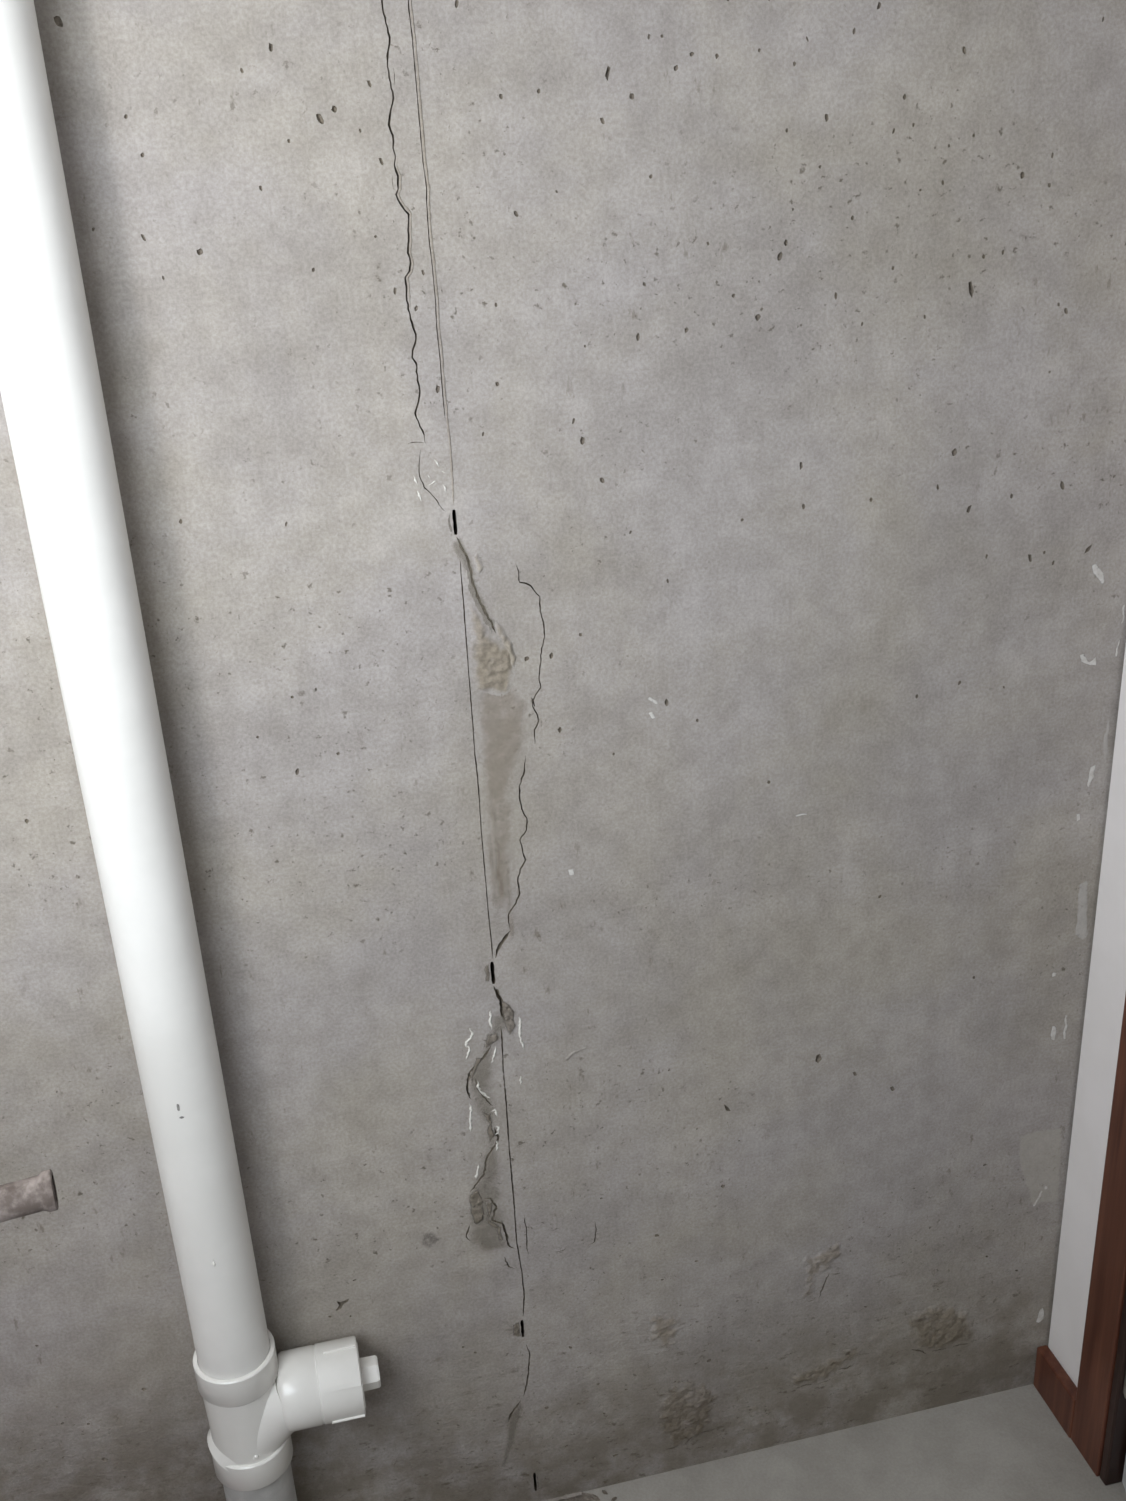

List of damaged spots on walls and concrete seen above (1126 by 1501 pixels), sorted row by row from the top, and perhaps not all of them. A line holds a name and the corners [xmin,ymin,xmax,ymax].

crack [381,0,442,508]
crack [495,565,545,958]
peeling [466,987,515,1268]
crack [524,1216,597,1252]
crack [508,1345,530,1422]